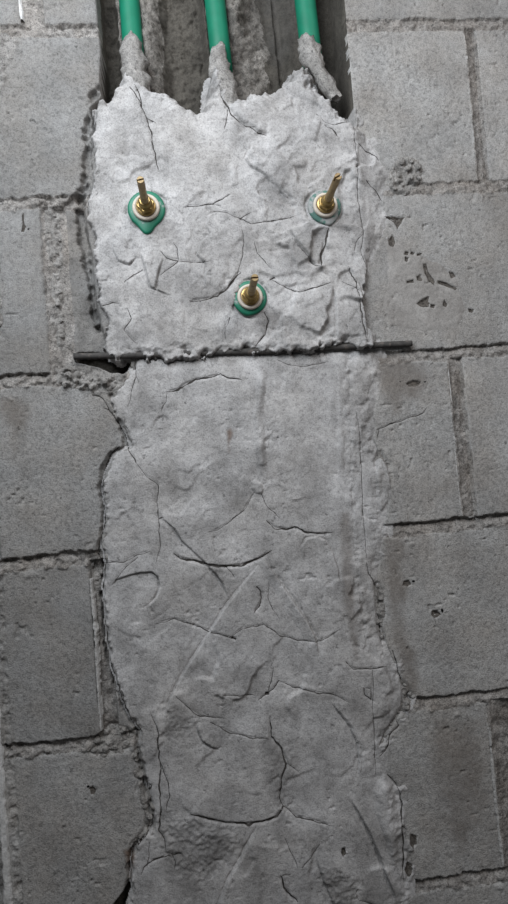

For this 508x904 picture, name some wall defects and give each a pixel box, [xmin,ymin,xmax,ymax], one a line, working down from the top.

crack [130,85,159,170]
crack [218,84,266,136]
crack [124,242,208,282]
crack [187,114,381,338]
peeling [385,213,404,247]
peeling [404,251,457,290]
peeling [417,296,447,308]
crack [356,407,427,586]
crack [93,302,340,878]
crack [178,616,408,902]